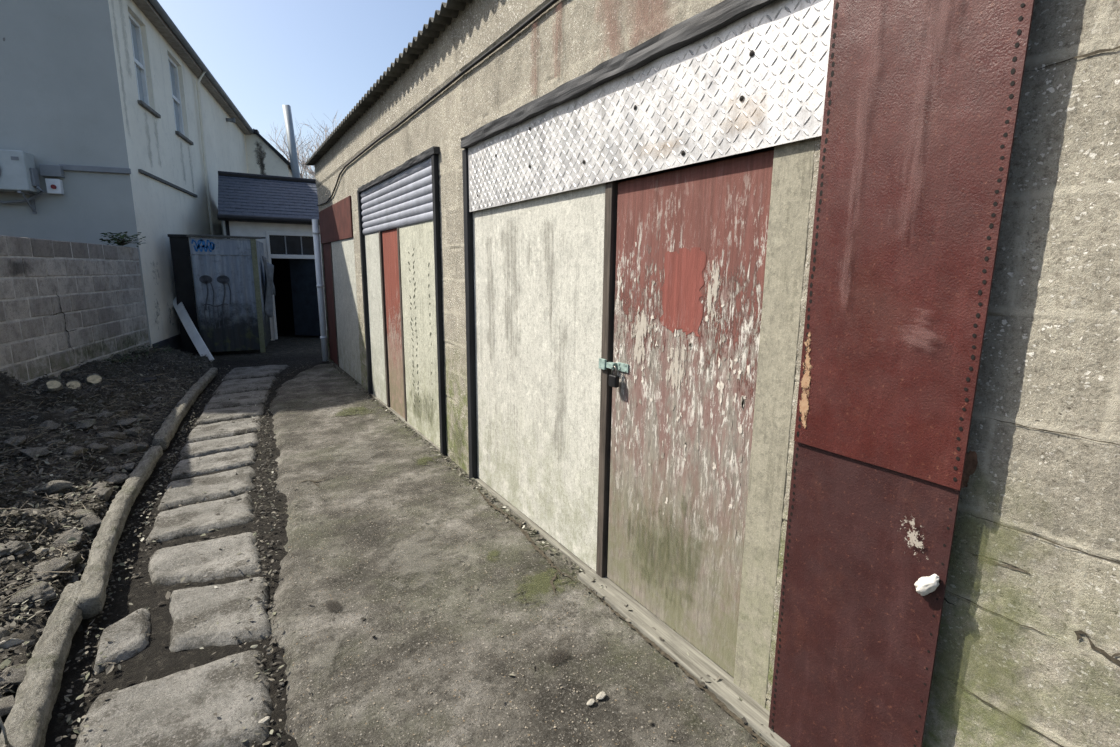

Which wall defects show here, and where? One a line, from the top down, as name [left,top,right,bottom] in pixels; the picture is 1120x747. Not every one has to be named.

crack [1024,46,1120,72]
peeling [615,273,692,451]
peeling [705,261,750,409]
rust [799,332,811,428]
crack [944,591,1120,666]